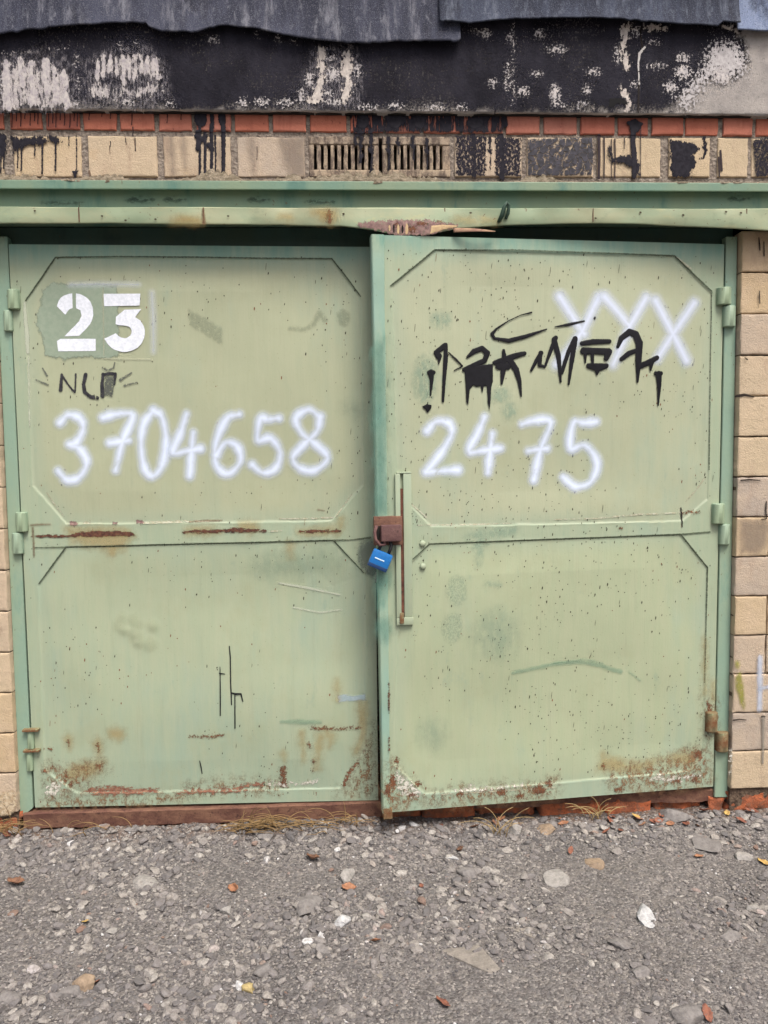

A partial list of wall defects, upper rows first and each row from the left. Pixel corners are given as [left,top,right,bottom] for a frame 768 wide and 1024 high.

peeling [0,41,177,111]
peeling [235,45,405,114]
spalling [609,21,671,113]
peeling [646,25,751,114]
water stain [0,112,111,174]
water stain [194,117,226,175]
water stain [353,128,430,173]
water stain [597,119,643,179]
corrosion [182,520,267,534]
corrosion [43,742,318,809]
corrosion [311,725,557,815]
corrosion [602,748,712,793]